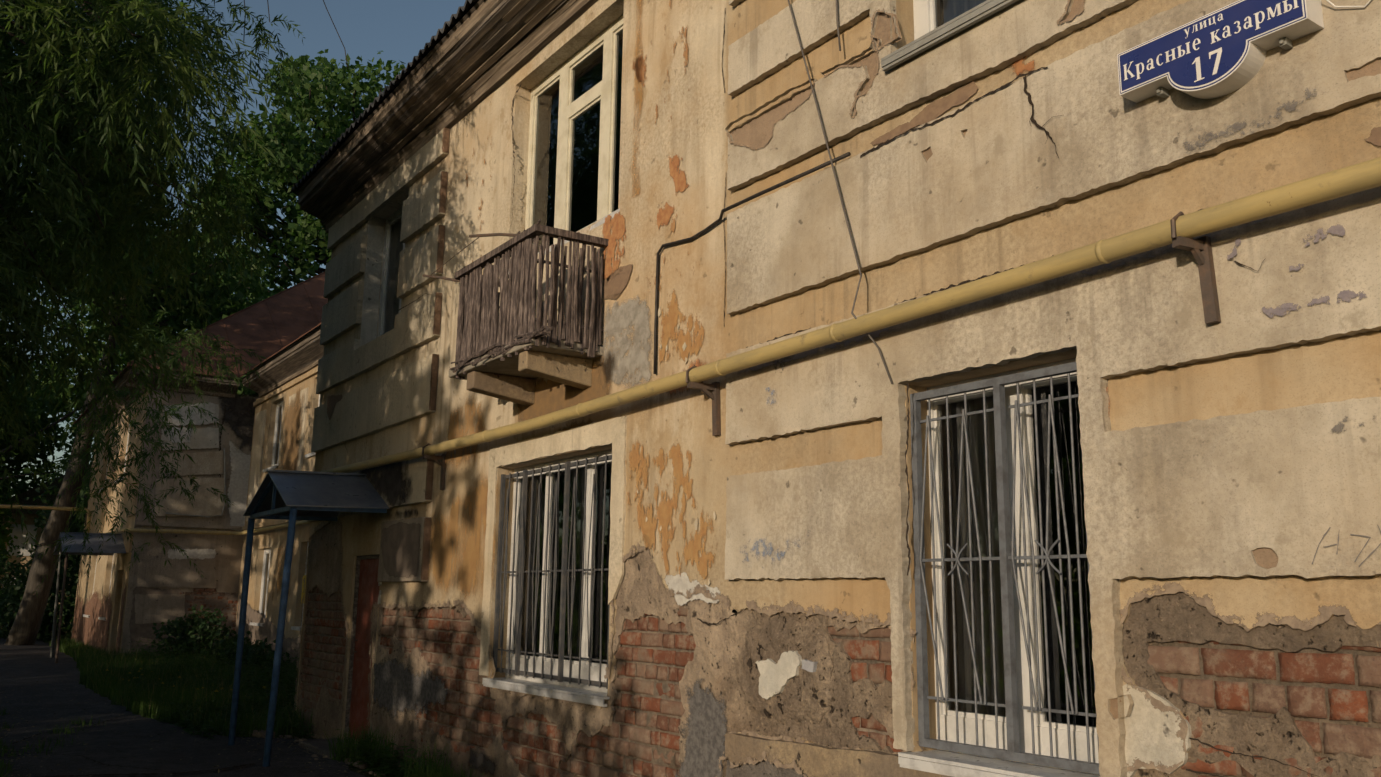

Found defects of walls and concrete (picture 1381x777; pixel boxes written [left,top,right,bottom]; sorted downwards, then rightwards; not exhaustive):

flaking render [1057,0,1085,24]
flaking render [726,8,902,150]
flaking render [871,80,978,145]
crack [860,67,1062,158]
peeling [657,154,693,232]
peeling [602,212,633,300]
peeling [644,253,704,364]
flaking render [71,588,112,651]
flaking render [129,518,348,739]
flaking render [367,440,924,777]
flaking render [1110,582,1381,777]